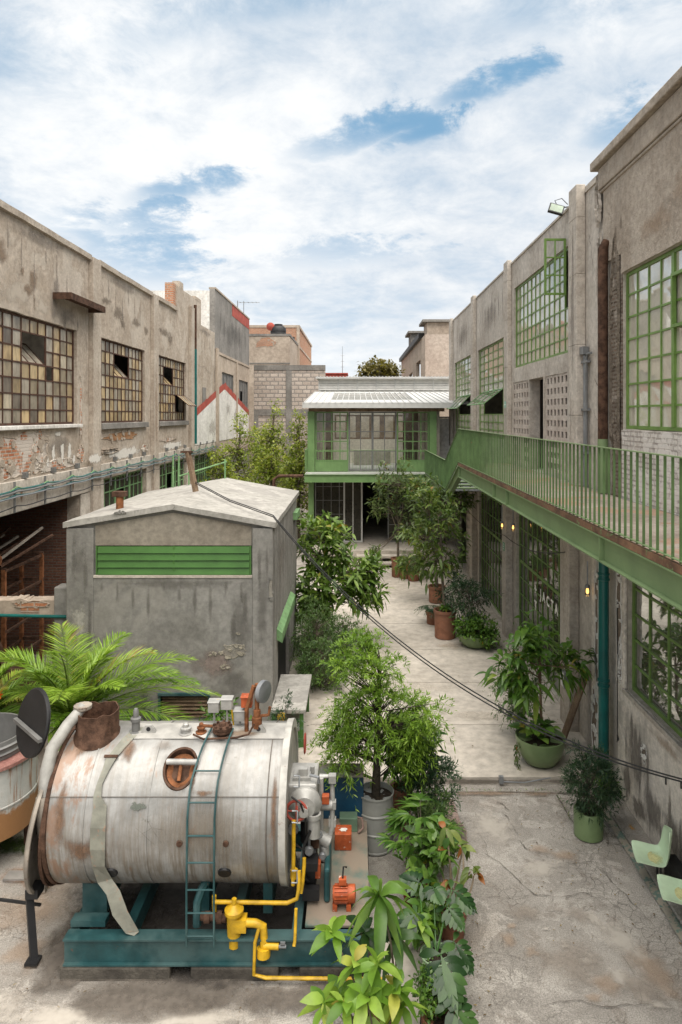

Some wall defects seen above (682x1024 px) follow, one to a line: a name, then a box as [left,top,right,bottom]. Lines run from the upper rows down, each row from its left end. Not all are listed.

damp [103,299,172,343]
flaking render [0,371,148,483]
flaking render [12,598,50,612]
damp [624,716,682,863]
crack [457,791,658,932]
crack [465,926,671,1009]